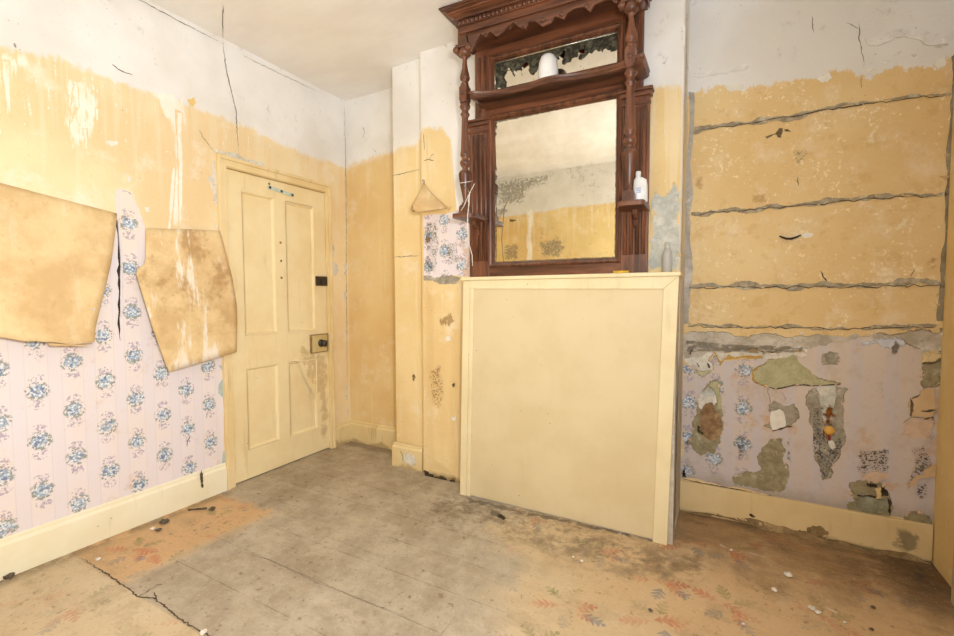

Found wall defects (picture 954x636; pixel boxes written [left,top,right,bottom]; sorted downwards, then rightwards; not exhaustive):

crack [140,0,238,139]
flaking render [648,55,954,456]
flaking render [764,385,850,480]
flaking render [847,471,894,516]